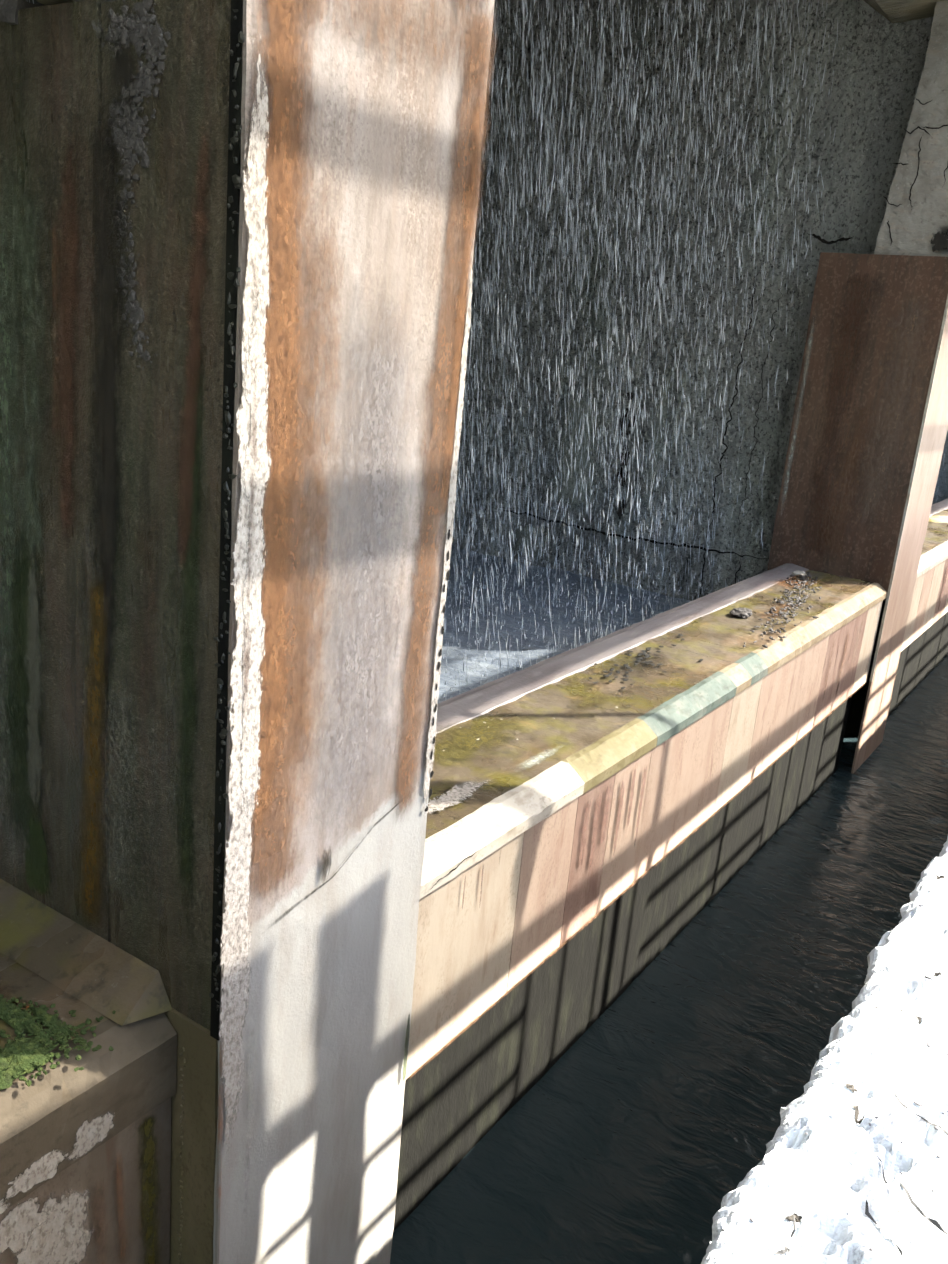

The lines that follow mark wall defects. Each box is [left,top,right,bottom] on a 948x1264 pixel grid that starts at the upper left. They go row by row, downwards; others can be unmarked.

damp [0,185,49,895]
damp [81,123,166,921]
spalling [99,0,171,369]
damp [178,360,202,887]
corrosion [249,0,337,895]
corrosion [398,0,492,809]
crack [807,233,853,244]
crack [884,99,948,243]
peeling [0,1112,114,1264]